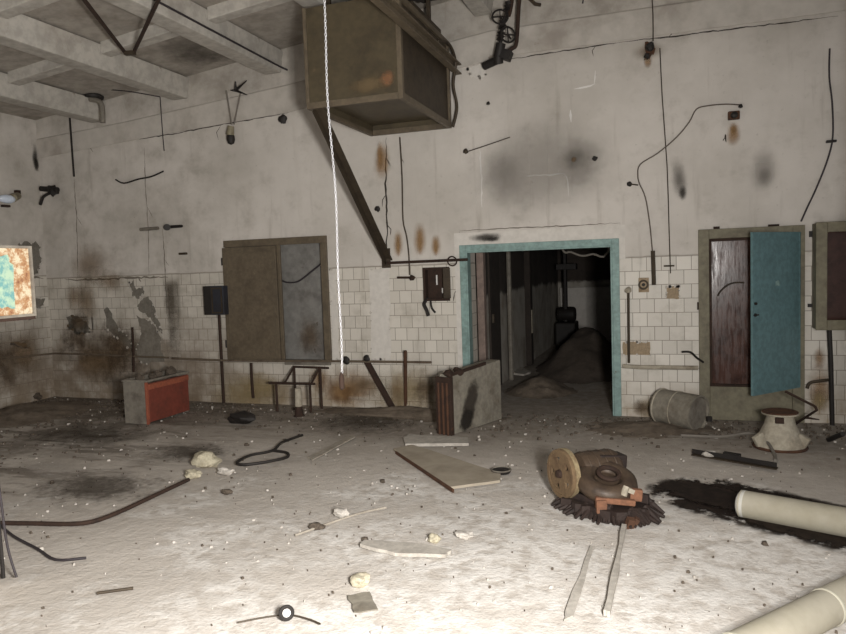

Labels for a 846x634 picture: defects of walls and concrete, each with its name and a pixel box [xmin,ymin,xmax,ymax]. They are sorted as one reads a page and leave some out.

spalling [18,241,43,276]
spalling [104,280,164,365]
water stain [460,384,477,431]